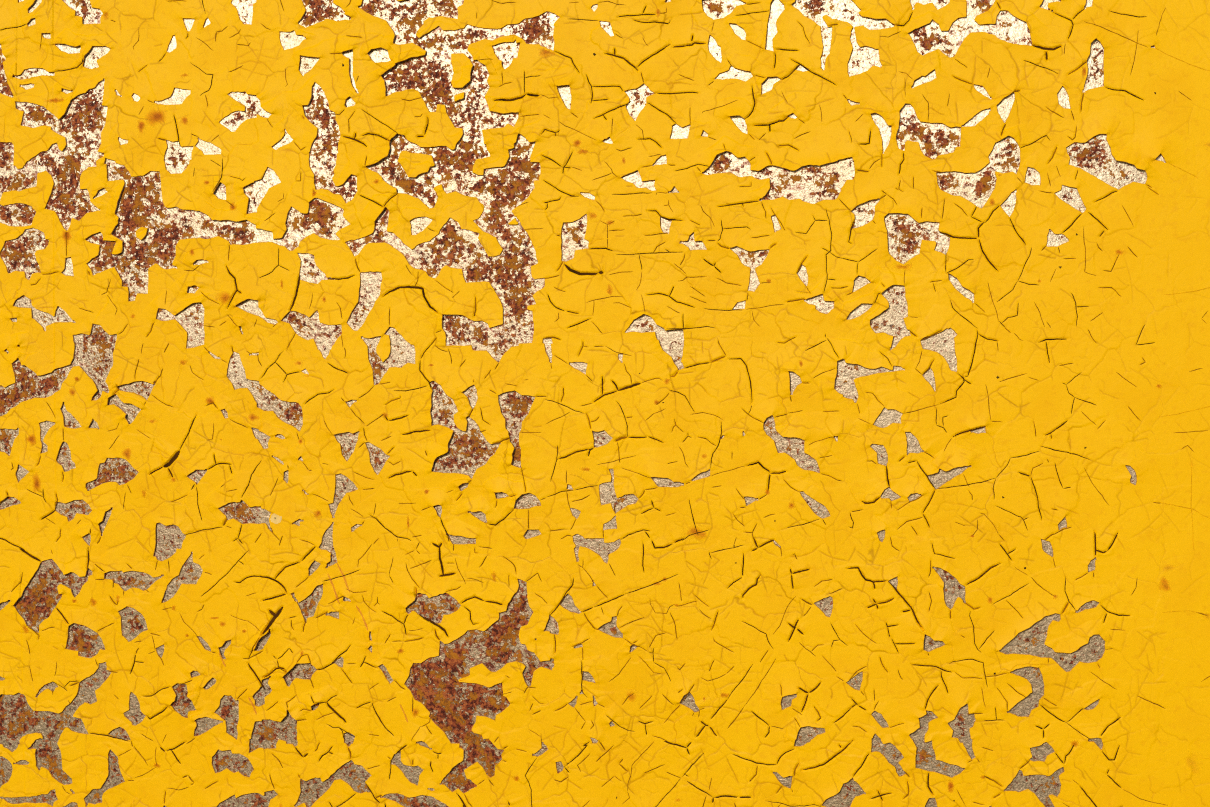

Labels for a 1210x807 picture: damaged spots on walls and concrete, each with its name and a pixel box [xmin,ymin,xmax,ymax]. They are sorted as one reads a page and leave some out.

crack [139,100,245,206]
crack [111,0,284,106]
peeling [0,0,560,484]
crack [331,77,429,163]
crack [494,1,847,164]
peeling [670,0,1040,217]
peeling [760,195,978,473]
crack [1001,8,1210,193]
crack [149,114,1165,807]
peeling [0,520,203,641]
peeling [0,617,145,807]
peeling [295,579,558,807]